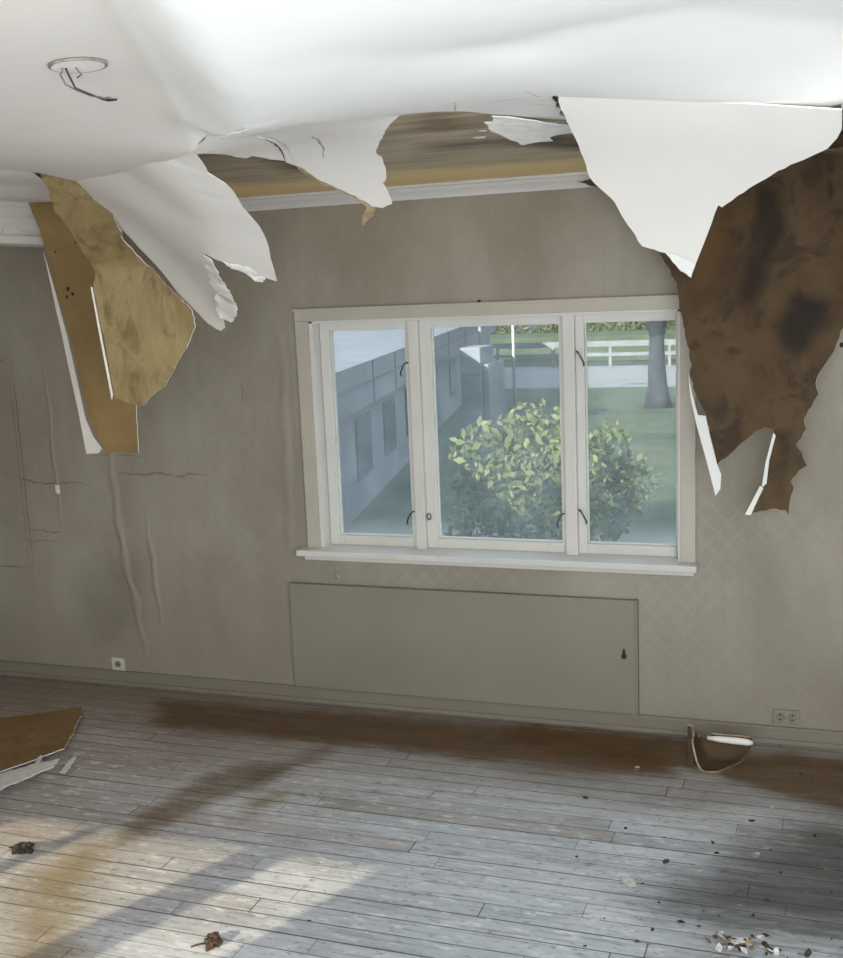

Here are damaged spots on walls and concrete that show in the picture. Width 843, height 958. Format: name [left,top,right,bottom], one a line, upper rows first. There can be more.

peeling [76,96,843,331]
damp [692,205,724,288]
crack [0,359,62,568]